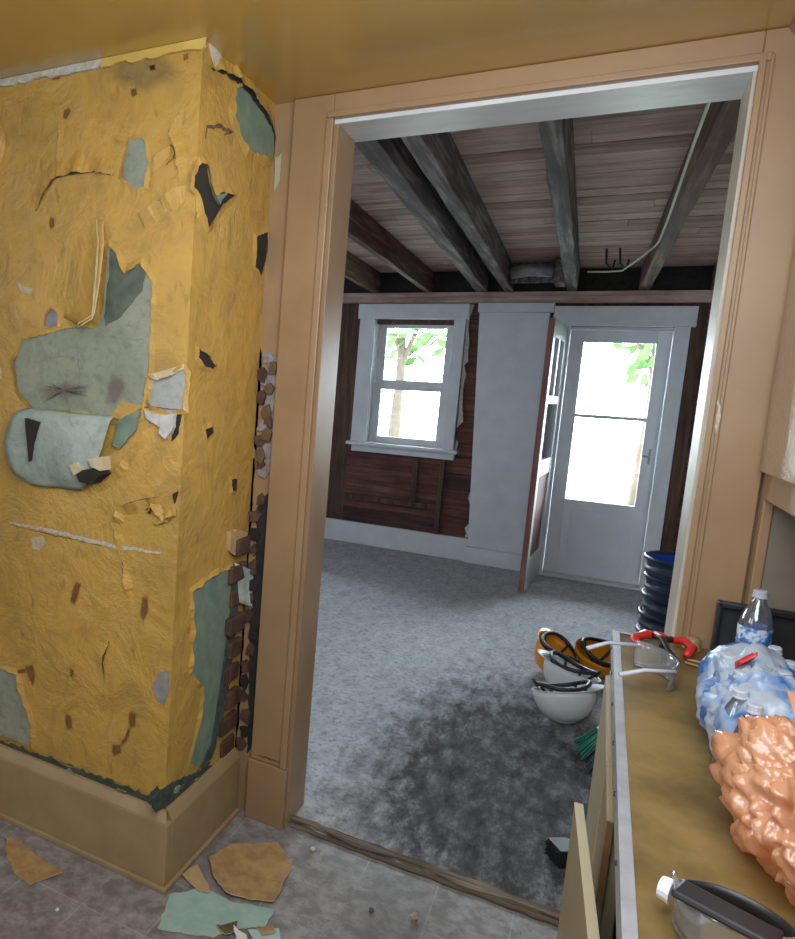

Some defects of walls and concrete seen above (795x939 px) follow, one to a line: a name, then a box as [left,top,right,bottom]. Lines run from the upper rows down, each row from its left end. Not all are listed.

peeling [118,134,153,196]
spalling [194,163,234,227]
peeling [209,43,282,192]
peeling [0,218,191,495]
flaking render [0,349,277,814]